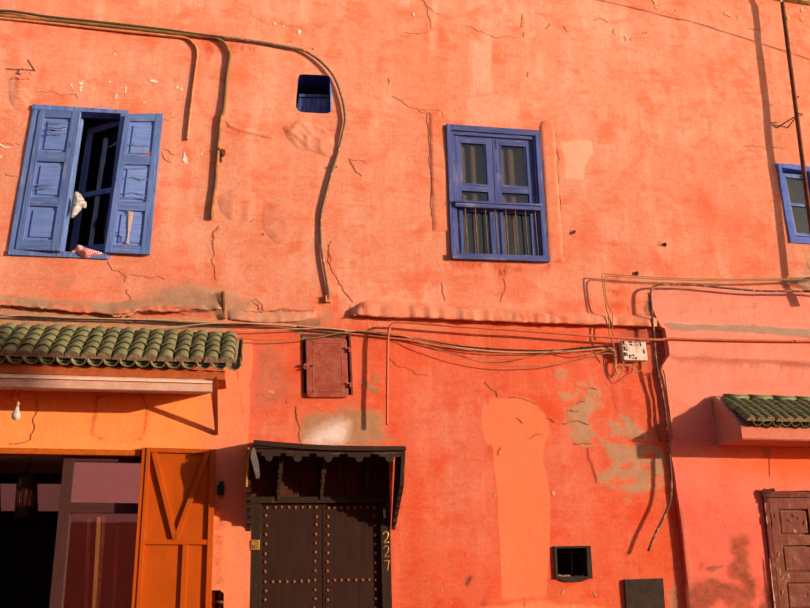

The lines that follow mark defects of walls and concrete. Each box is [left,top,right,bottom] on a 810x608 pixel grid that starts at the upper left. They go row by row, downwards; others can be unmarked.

crack [403,0,439,34]
crack [125,144,181,162]
crack [115,177,149,244]
crack [211,225,221,279]
crack [107,261,164,317]
crack [9,394,38,444]
crack [485,382,597,483]
peeling [559,378,667,493]
damp [667,535,774,608]